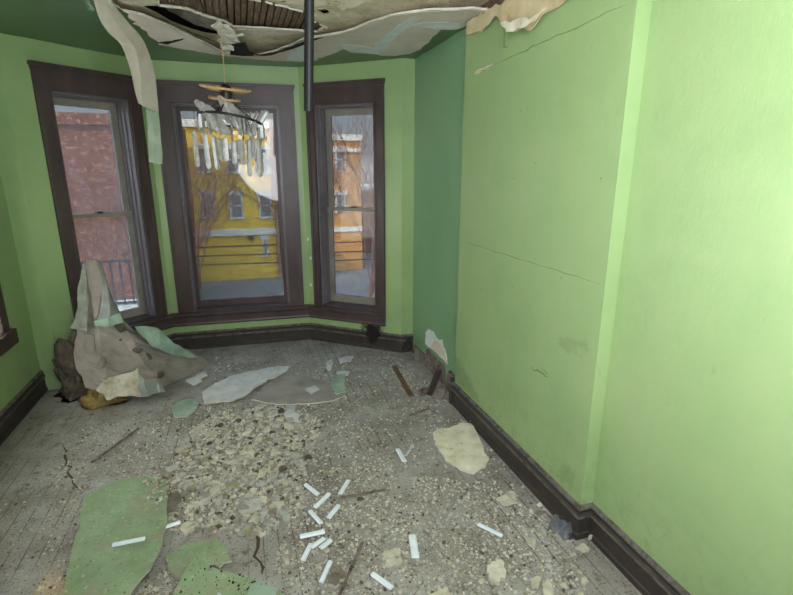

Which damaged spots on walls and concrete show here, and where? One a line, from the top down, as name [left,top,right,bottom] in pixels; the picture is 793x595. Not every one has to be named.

peeling [118,0,304,62]
peeling [314,0,486,61]
crack [472,5,625,75]
peeling [425,329,448,364]